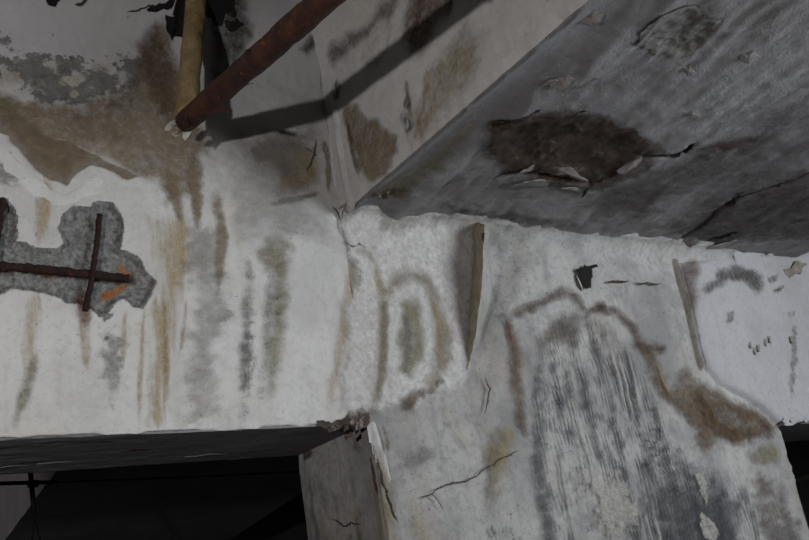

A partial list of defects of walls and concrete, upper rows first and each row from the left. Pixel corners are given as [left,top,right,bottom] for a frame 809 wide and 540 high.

peeling [0,36,144,109]
leakage [0,25,207,289]
leakage [343,105,396,180]
leakage [482,110,694,217]
spalling [0,143,156,317]
leakage [214,199,229,284]
spalling [576,264,598,290]
leakage [708,266,762,291]
spalling [317,407,370,440]
leakage [505,288,798,540]
crack [376,459,398,521]
crack [419,451,516,507]